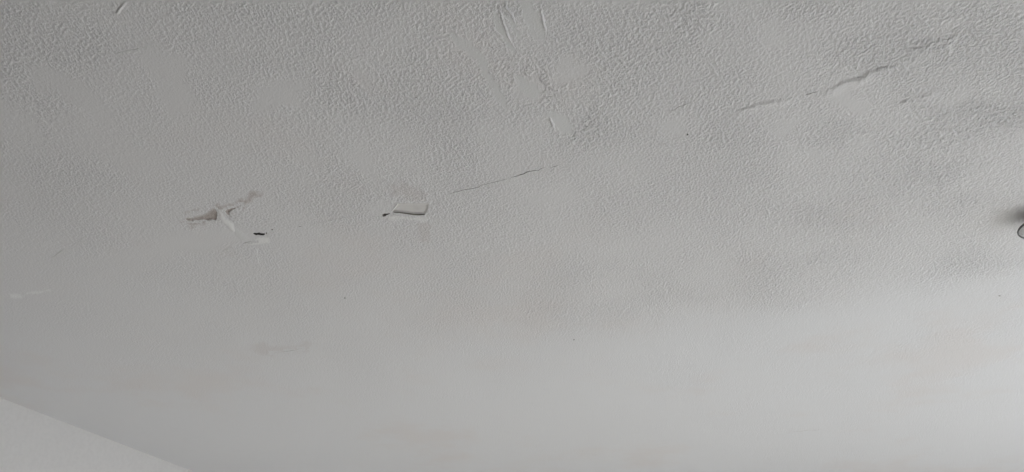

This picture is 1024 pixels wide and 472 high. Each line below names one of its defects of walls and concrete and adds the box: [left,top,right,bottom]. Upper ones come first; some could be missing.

flaking render [179,189,268,231]
flaking render [382,203,430,223]